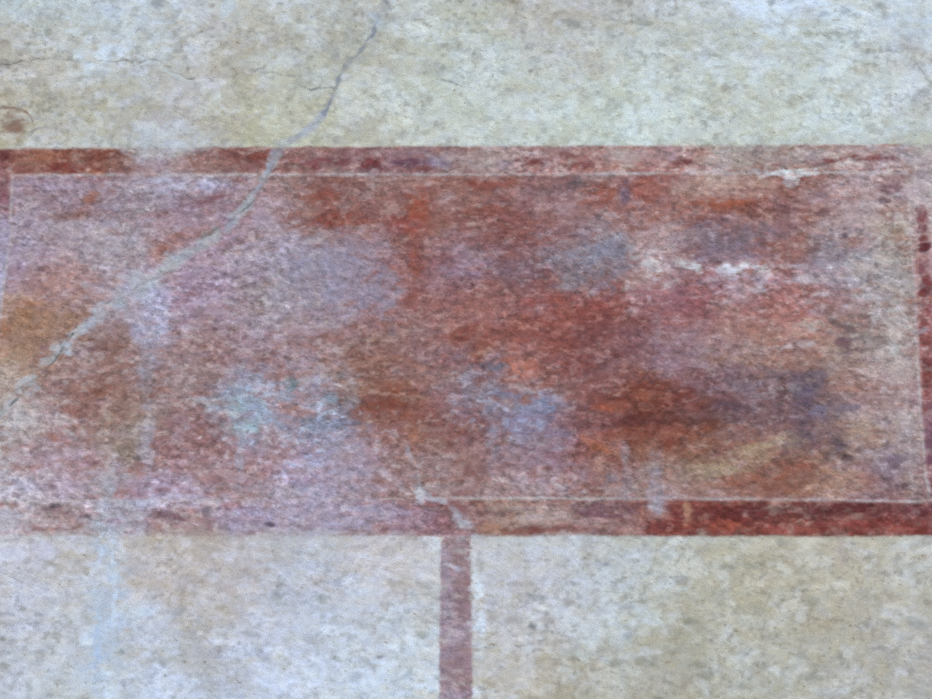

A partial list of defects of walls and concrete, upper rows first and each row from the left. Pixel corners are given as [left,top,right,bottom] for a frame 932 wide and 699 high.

crack [0,0,404,423]